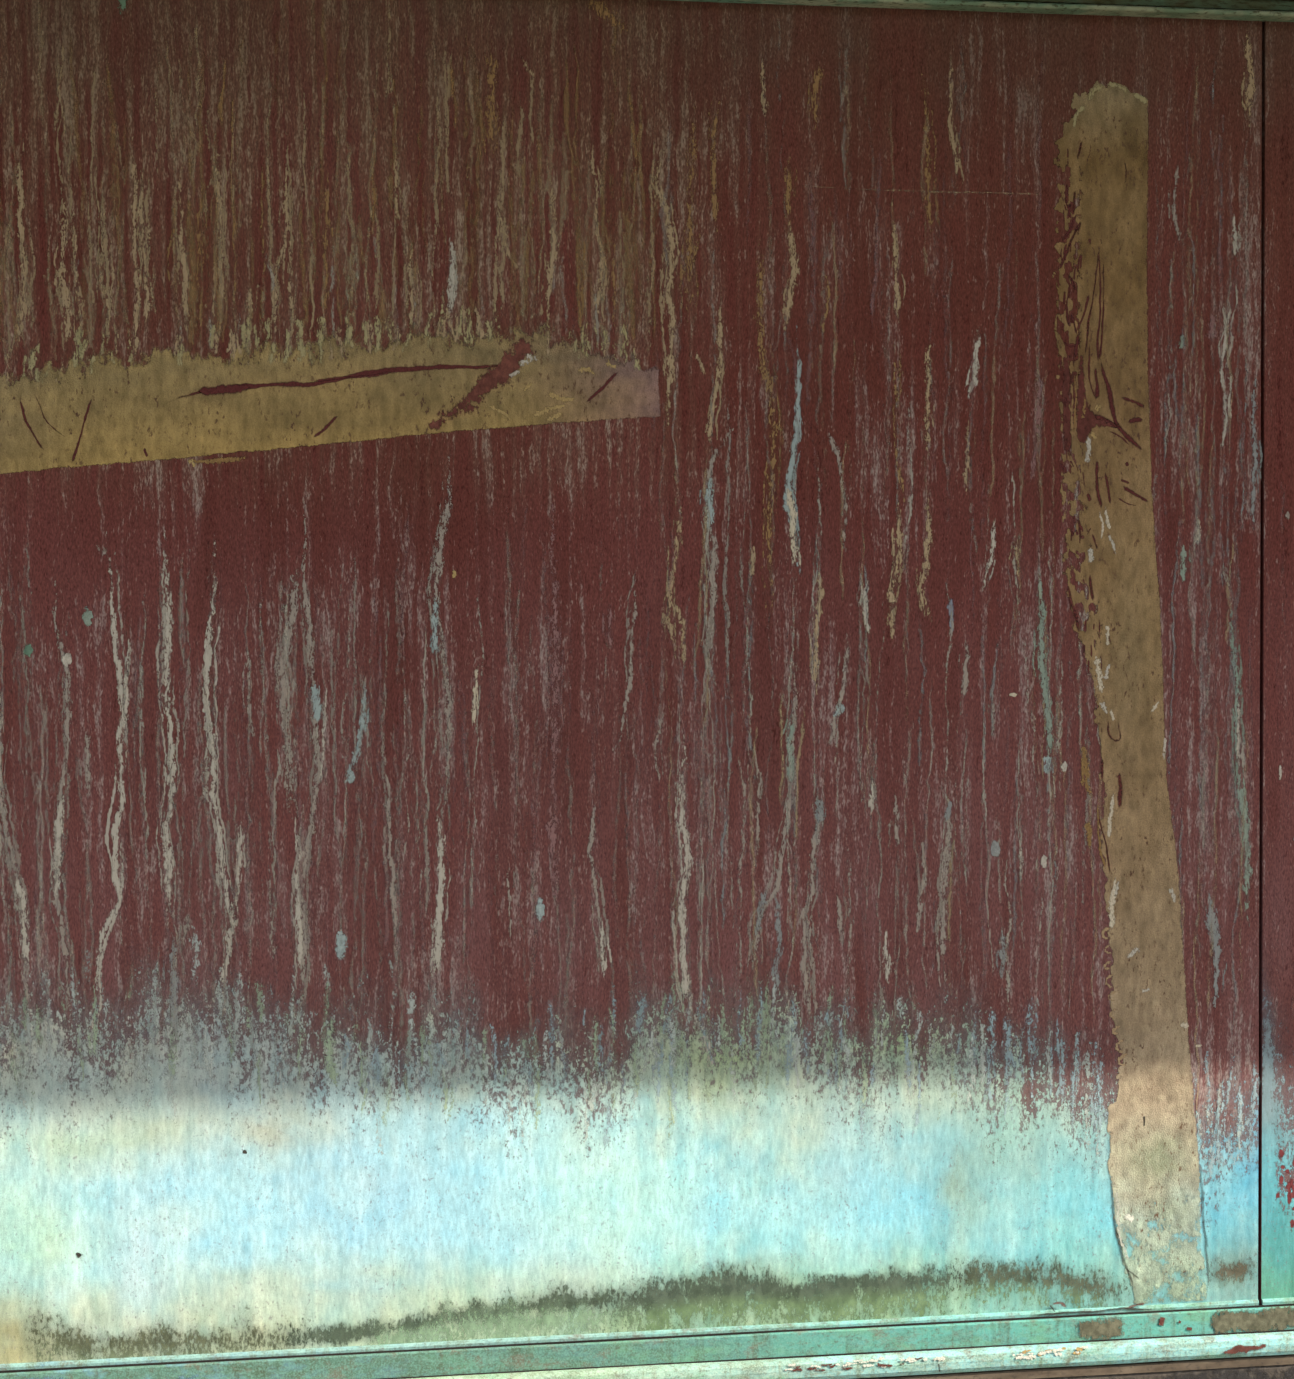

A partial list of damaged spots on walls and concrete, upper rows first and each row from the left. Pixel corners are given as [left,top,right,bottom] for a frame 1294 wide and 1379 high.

water stain [921,60,964,237]
water stain [892,202,906,322]
water stain [1167,166,1182,317]
peeling [1073,376,1101,462]
peeling [1088,510,1116,562]
water stain [1205,71,1263,926]
peeling [62,653,72,668]
peeling [1094,626,1115,721]
water stain [0,297,1294,1364]
peeling [335,931,348,960]
peeling [536,898,545,922]
peeling [1108,877,1119,928]